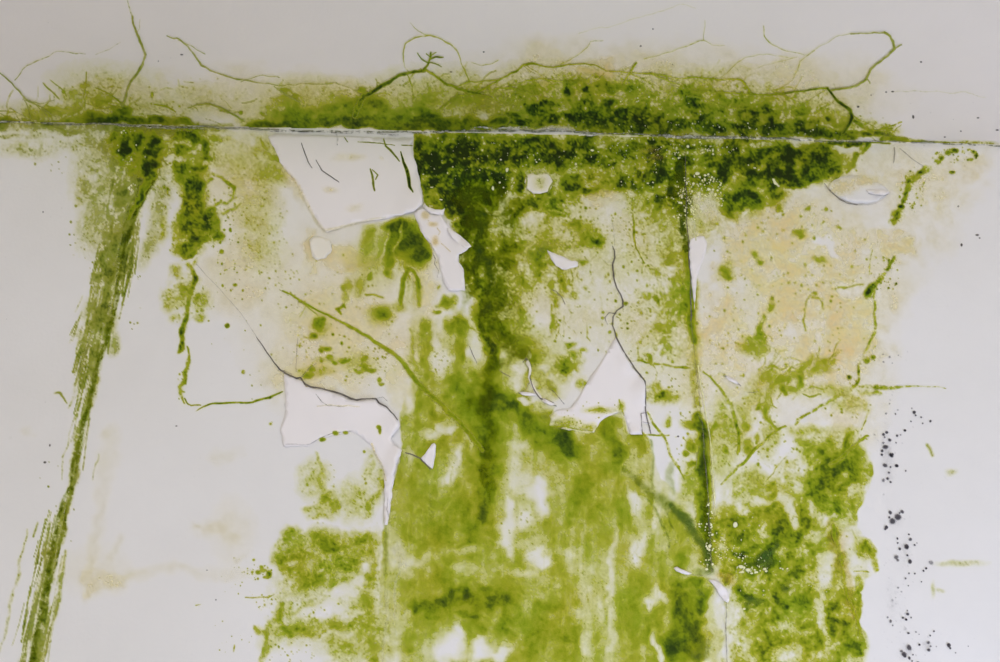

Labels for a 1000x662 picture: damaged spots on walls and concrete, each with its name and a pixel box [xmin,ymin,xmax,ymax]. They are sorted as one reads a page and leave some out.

peeling [268,133,471,291]
crack [0,121,1000,320]
peeling [525,171,553,194]
peeling [547,250,578,270]
water stain [0,72,283,662]
crack [252,330,398,420]
peeling [280,374,402,525]
peeling [421,443,436,469]
peeling [520,337,648,435]
water stain [231,62,993,662]
crack [601,246,651,434]
crack [694,351,716,527]